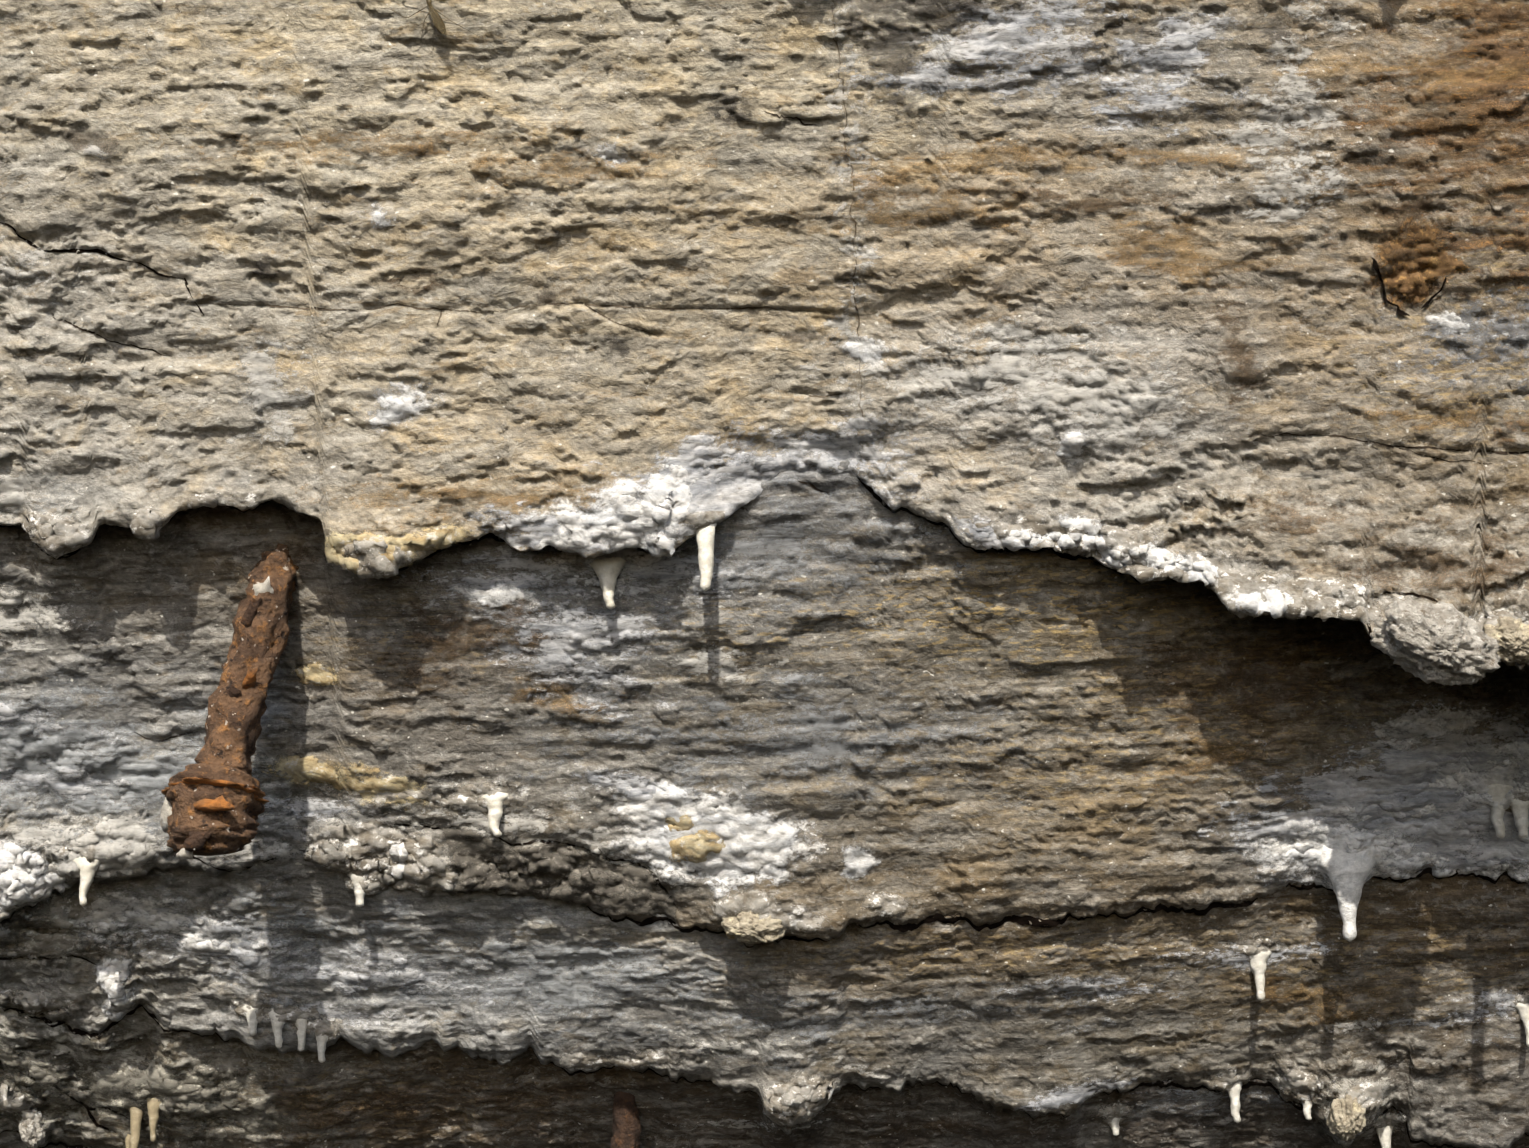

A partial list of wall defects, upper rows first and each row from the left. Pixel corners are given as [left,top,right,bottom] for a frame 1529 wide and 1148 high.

crack [2,3,863,433]
crack [798,476,1205,586]
rust [233,582,261,628]
crack [1367,592,1438,654]
rust [223,667,258,698]
water stain [0,229,1529,1132]
rust [161,777,269,821]
crack [355,819,1333,948]
crack [1373,867,1528,884]
crack [1,1004,229,1042]
crack [1,1071,128,1148]
crack [854,1078,1334,1141]